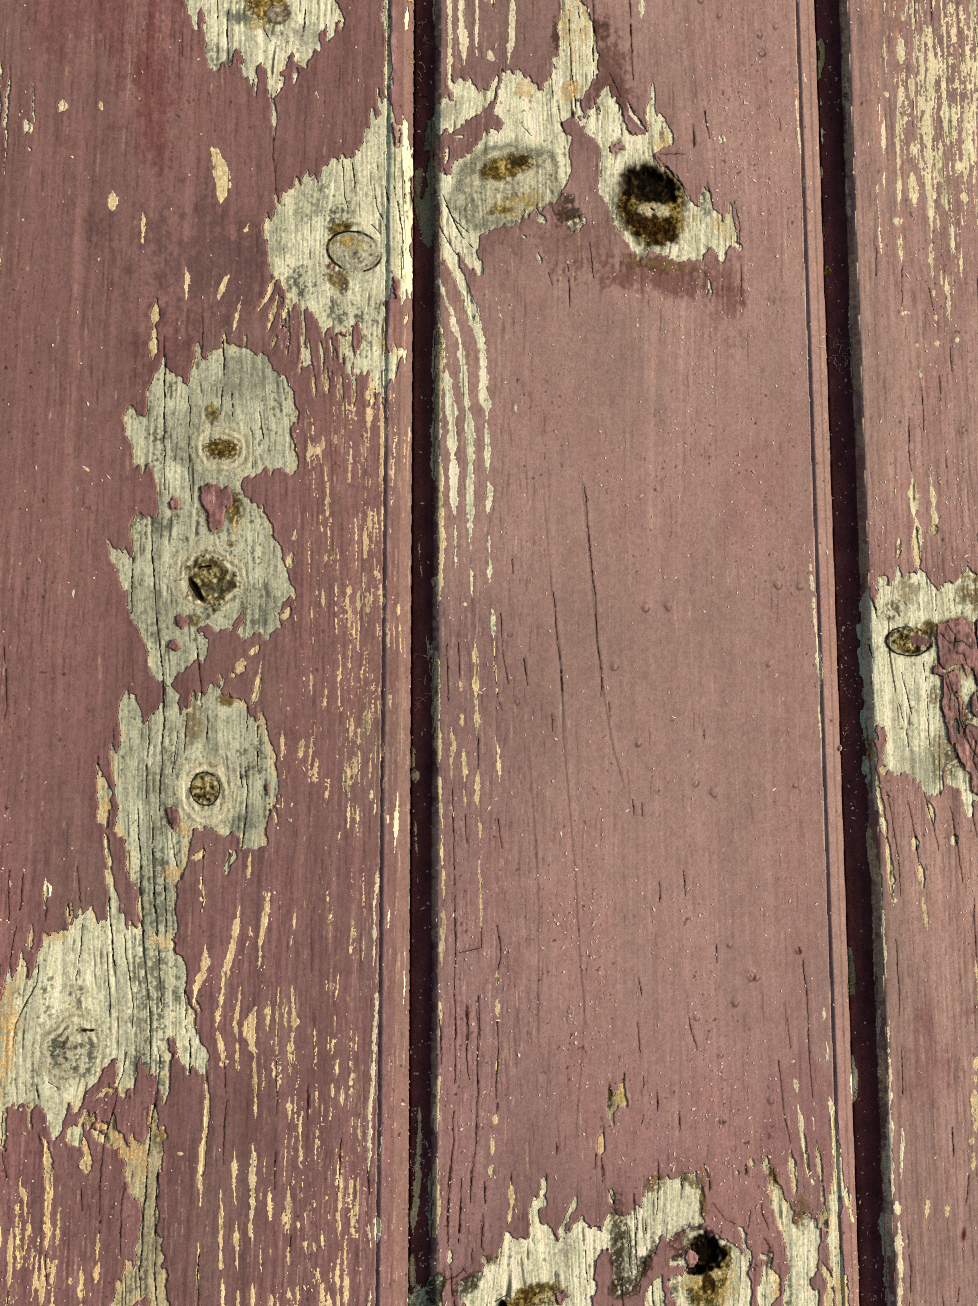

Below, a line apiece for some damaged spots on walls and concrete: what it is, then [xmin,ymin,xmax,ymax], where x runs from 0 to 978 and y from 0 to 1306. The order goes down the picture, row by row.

peeling [868,0,978,321]
peeling [0,0,742,1306]
peeling [407,1060,854,1306]
peeling [856,475,978,1306]